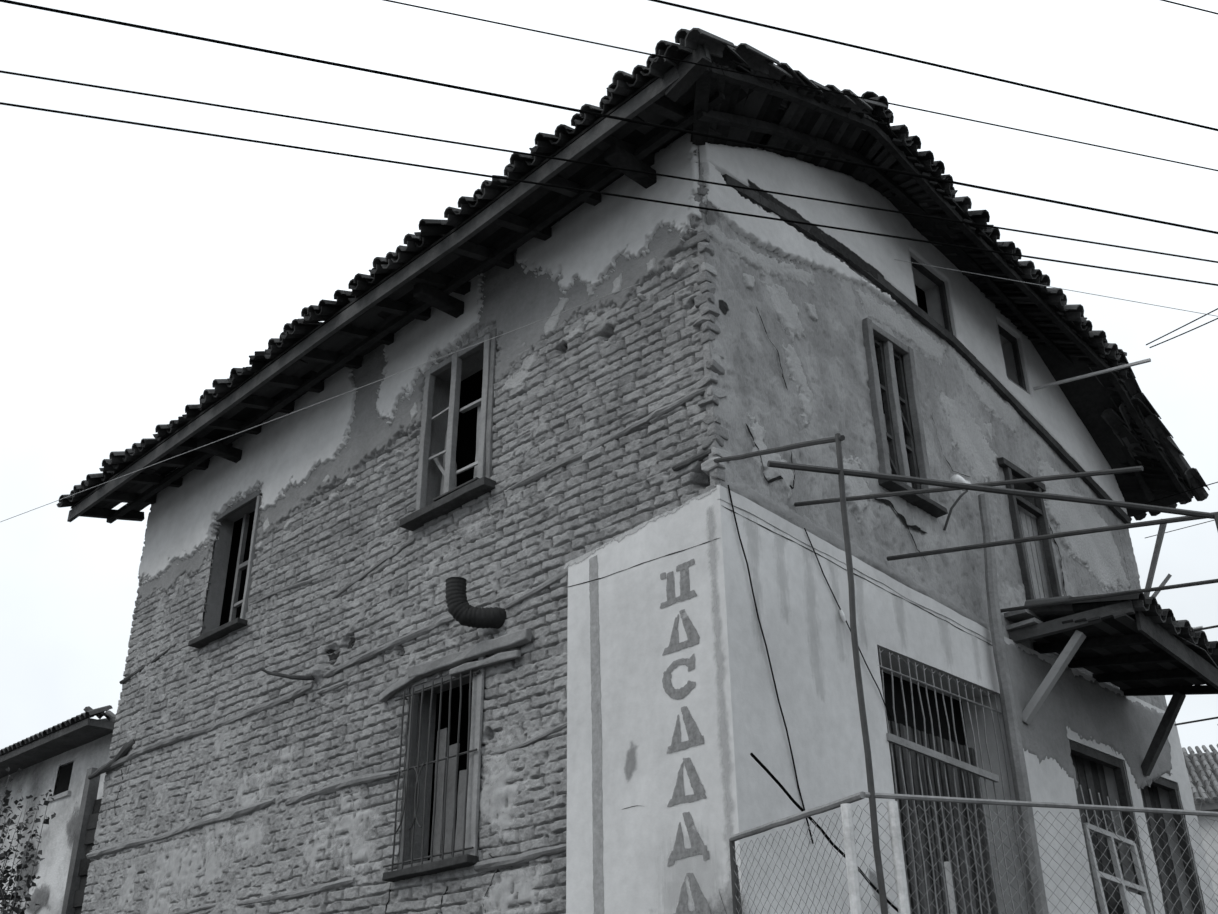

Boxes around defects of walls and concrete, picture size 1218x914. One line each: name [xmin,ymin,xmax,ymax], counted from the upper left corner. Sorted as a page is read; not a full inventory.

peeling [375,273,485,425]
peeling [500,353,543,393]
peeling [516,130,1017,499]
peeling [138,367,359,587]
peeling [835,454,872,524]
peeling [1036,453,1131,593]
spalling [326,637,356,665]